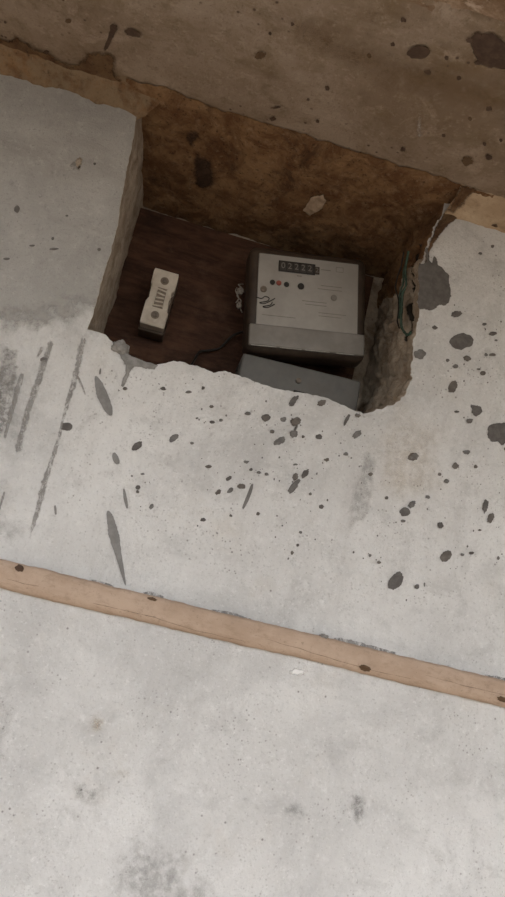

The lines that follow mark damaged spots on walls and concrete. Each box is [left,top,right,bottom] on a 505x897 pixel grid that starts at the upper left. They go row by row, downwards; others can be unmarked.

leakage [466,33,505,69]
flaking render [303,195,326,216]
leakage [417,247,463,317]
leakage [446,316,502,393]
leakage [0,342,53,451]
leakage [32,339,127,524]